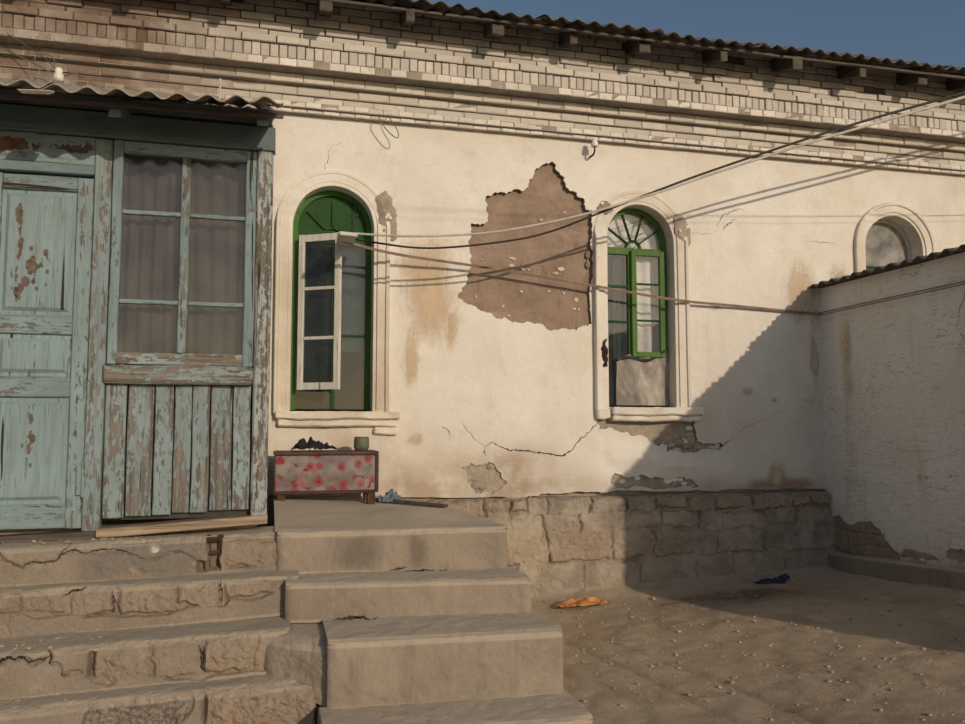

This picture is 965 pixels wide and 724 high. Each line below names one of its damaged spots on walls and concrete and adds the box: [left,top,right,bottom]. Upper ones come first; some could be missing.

peeling [0,136,93,154]
flaking render [376,191,397,241]
peeling [13,203,49,302]
flaking render [458,163,614,331]
crack [443,422,597,457]
flaking render [597,415,721,453]
flaking render [461,462,506,495]
flaking render [611,473,697,492]
crack [0,543,132,568]
flaking render [832,513,965,564]
crack [0,649,66,676]